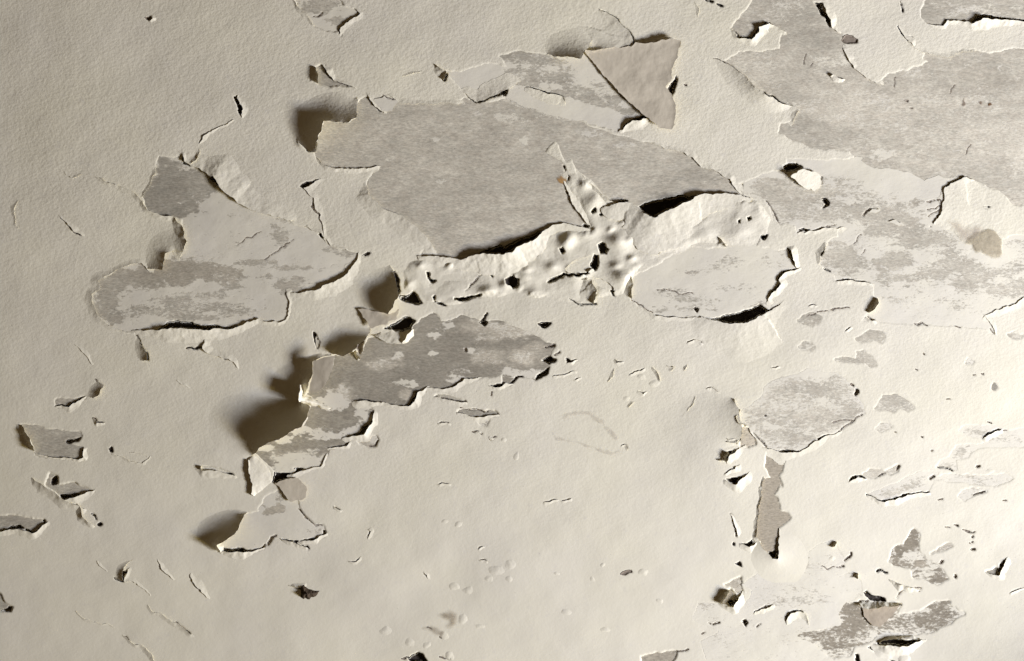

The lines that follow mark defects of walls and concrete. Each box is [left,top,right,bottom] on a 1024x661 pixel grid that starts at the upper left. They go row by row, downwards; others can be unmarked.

peeling [84,149,364,348]
peeling [218,0,1024,661]
peeling [0,515,50,540]
peeling [16,424,88,462]